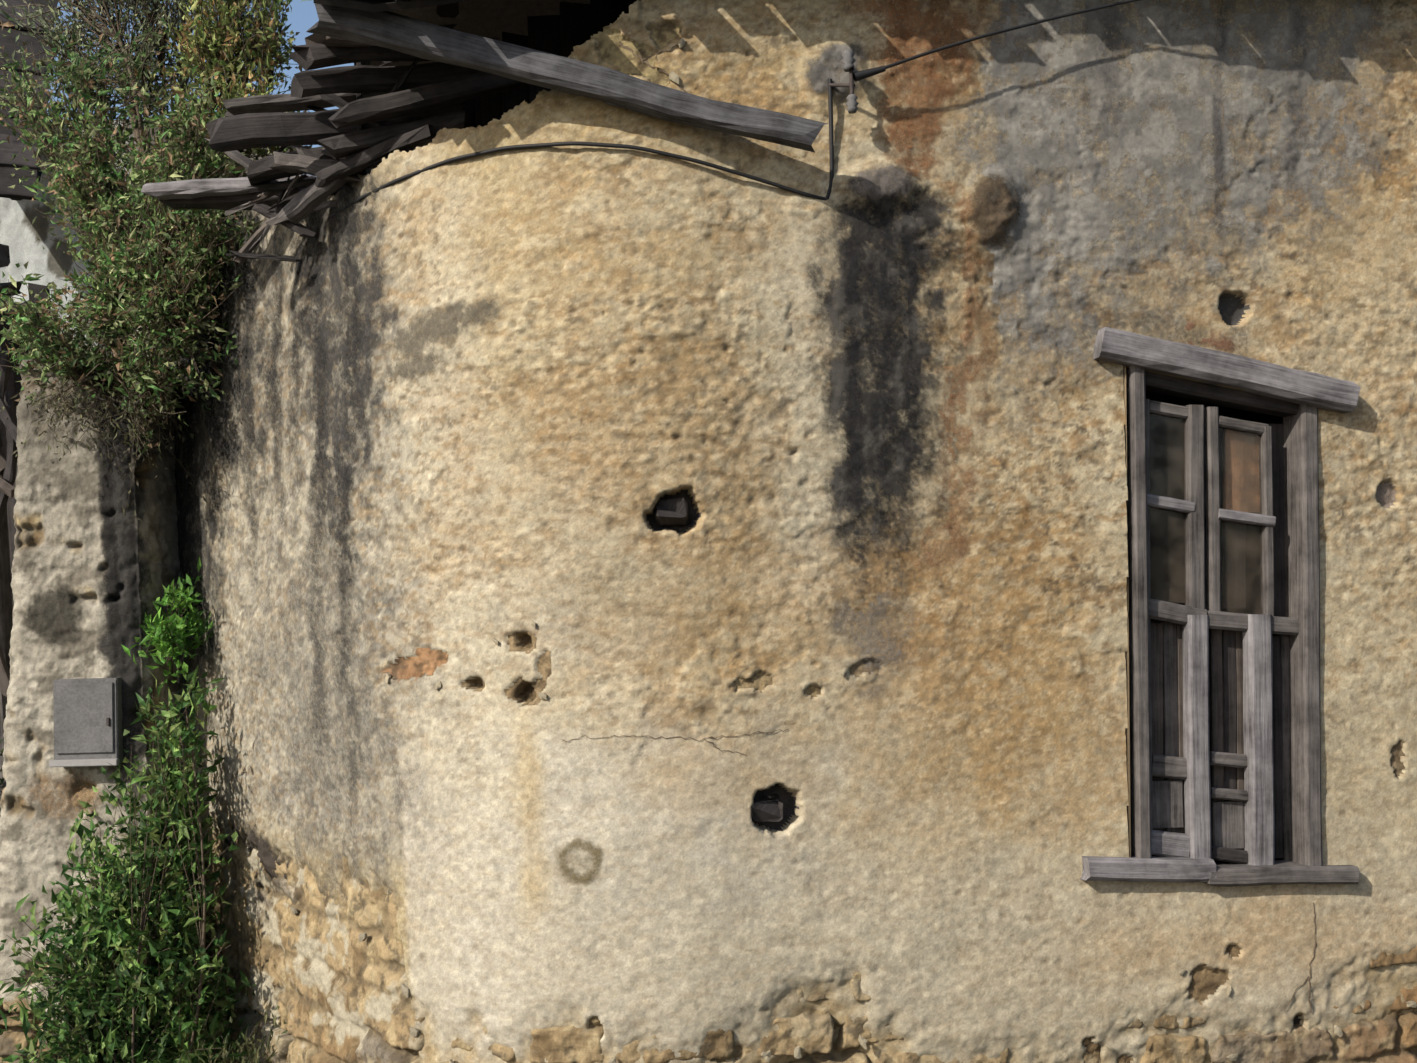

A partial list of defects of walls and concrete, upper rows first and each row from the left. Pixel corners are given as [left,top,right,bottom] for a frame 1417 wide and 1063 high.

corrosion [850,0,984,180]
damp [956,0,1391,377]
spalling [1218,294,1250,326]
damp [807,185,956,563]
damp [150,174,499,894]
spalling [646,490,701,533]
spalling [461,677,485,691]
spalling [492,620,551,705]
crack [561,728,789,755]
spalling [751,784,799,831]
spalling [1179,945,1240,1005]
crack [1284,902,1317,1013]